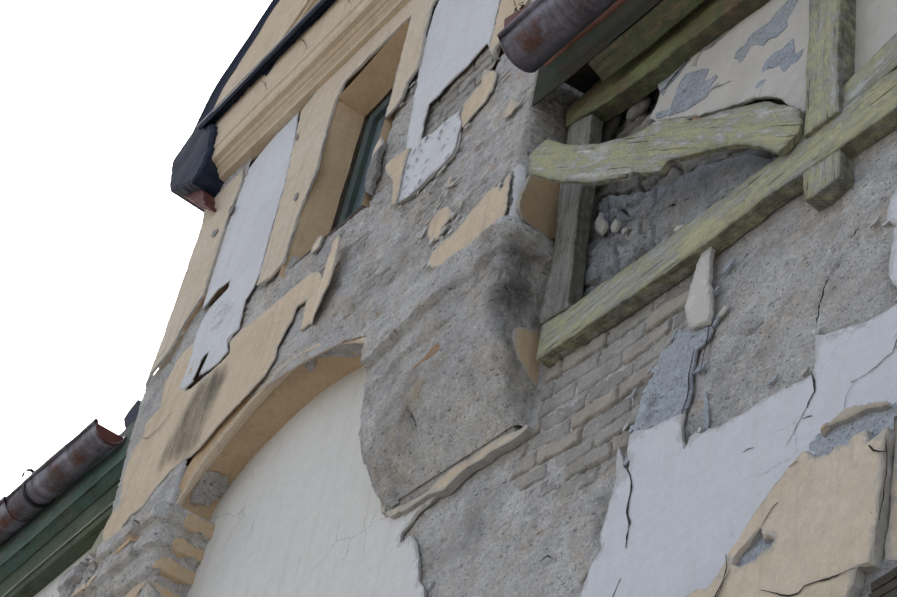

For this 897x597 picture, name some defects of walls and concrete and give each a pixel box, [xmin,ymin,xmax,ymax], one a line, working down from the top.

peeling [734,0,798,63]
spalling [228,38,897,597]
crack [844,333,897,409]
damp [163,373,223,458]
crack [787,373,815,467]
spalling [57,460,229,597]
crack [624,470,632,548]
crack [868,440,887,520]
crack [714,555,730,597]
crack [761,568,854,597]